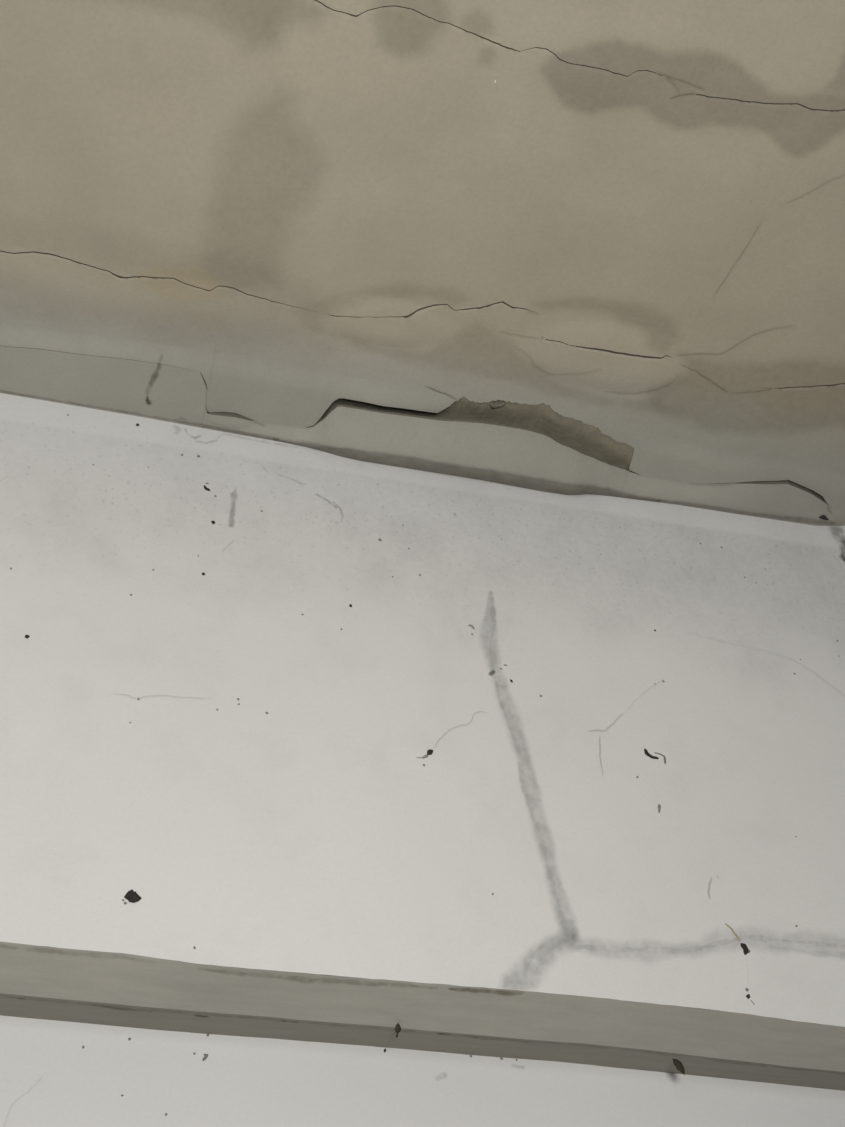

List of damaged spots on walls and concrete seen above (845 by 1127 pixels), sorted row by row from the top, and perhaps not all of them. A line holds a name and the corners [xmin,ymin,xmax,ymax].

crack [314,0,845,112]
damp [0,0,845,448]
crack [712,174,845,300]
crack [0,251,845,395]
peeling [308,386,635,490]
crack [432,590,845,992]